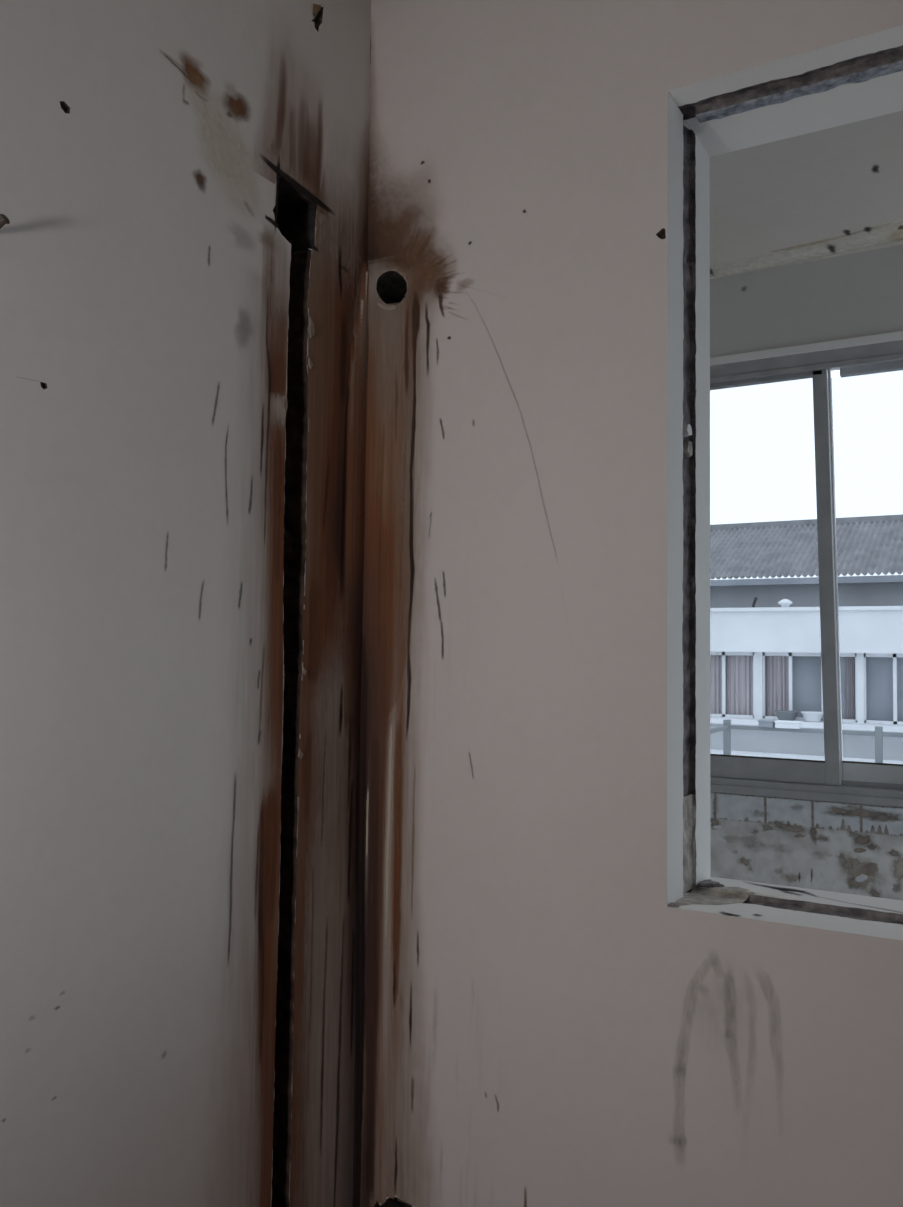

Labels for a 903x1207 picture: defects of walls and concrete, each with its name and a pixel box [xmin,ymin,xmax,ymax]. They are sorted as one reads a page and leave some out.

rust [167,57,206,103]
rust [226,96,247,118]
rust [256,248,288,1207]
rust [282,124,446,1207]